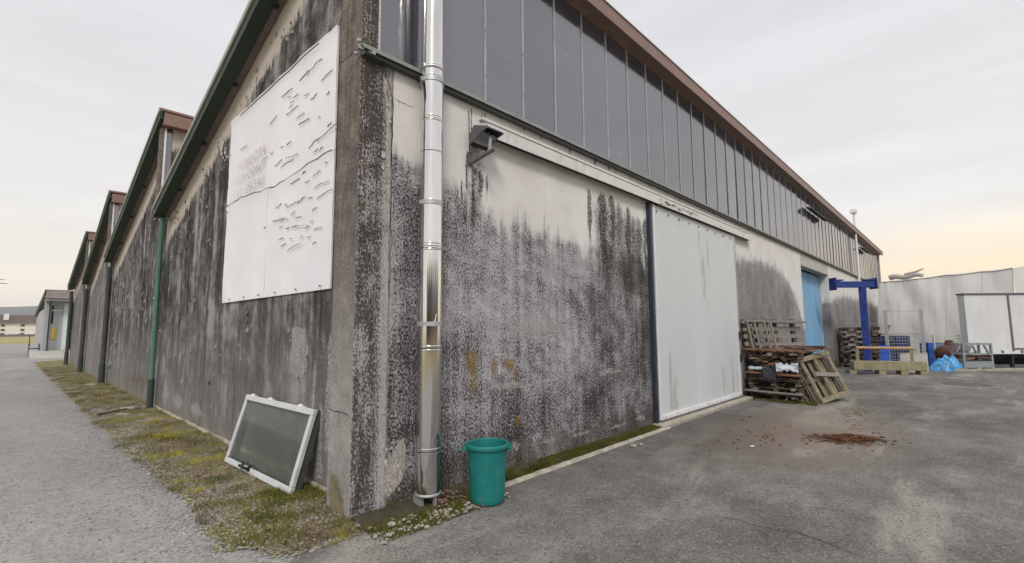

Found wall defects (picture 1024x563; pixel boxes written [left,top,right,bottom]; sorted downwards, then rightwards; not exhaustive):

water stain [461,147,488,216]
water stain [588,190,647,287]
water stain [310,335,331,479]